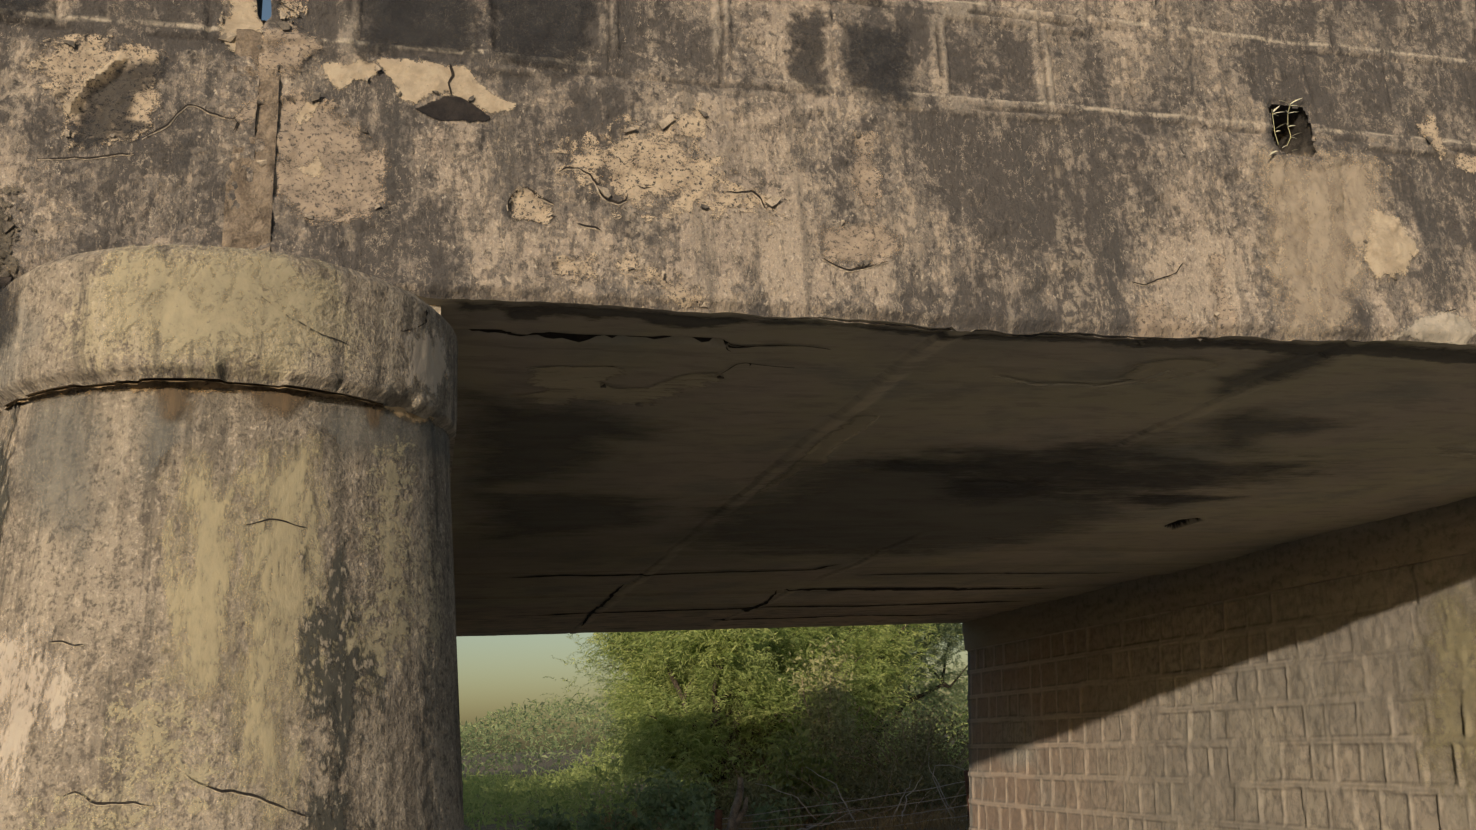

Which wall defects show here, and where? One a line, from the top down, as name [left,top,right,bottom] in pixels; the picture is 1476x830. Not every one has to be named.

spalling [25,0,516,226]
spalling [0,184,38,288]
crack [401,310,428,332]
crack [469,329,831,374]
damp [465,400,652,539]
damp [695,459,1233,555]
crack [517,564,1099,627]
crack [62,791,154,808]
crack [184,773,326,817]